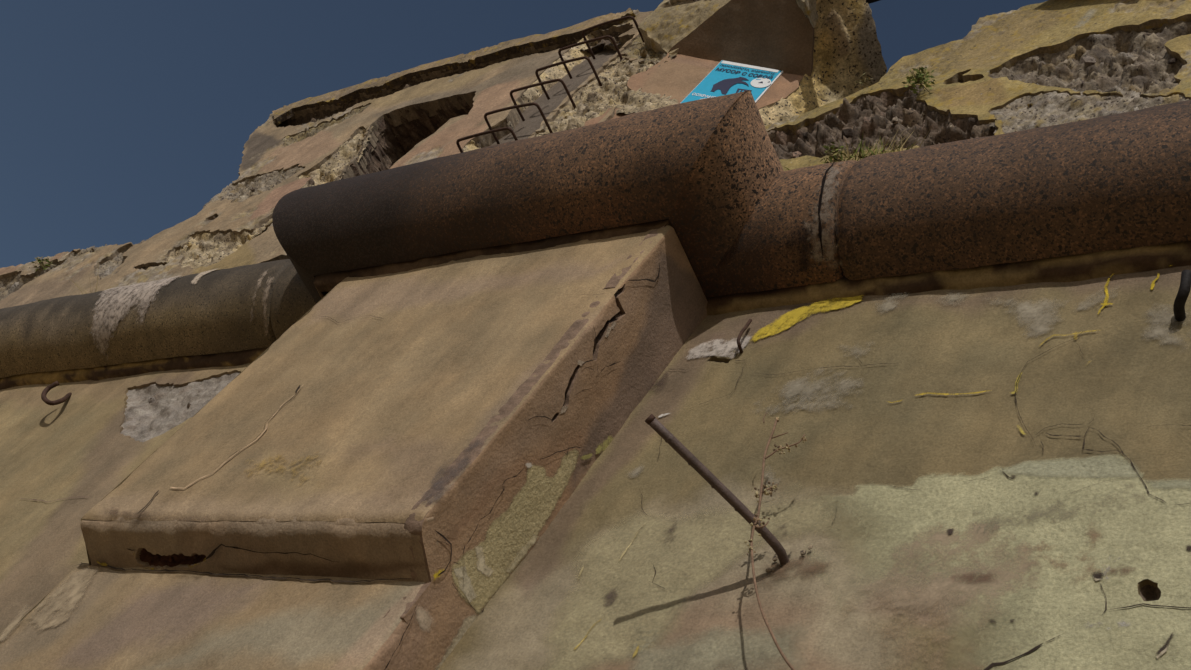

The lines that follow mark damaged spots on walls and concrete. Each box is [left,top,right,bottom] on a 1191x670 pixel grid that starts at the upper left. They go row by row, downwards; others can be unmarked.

spalling [767,21,1191,159]
spalling [121,372,240,442]
crack [137,384,304,514]
crack [529,263,660,421]
crack [1015,339,1190,505]
crack [74,544,405,582]
crack [384,604,418,670]
peeling [416,607,431,630]
peeling [436,449,579,670]
crack [435,447,581,613]
peeling [549,455,1191,670]